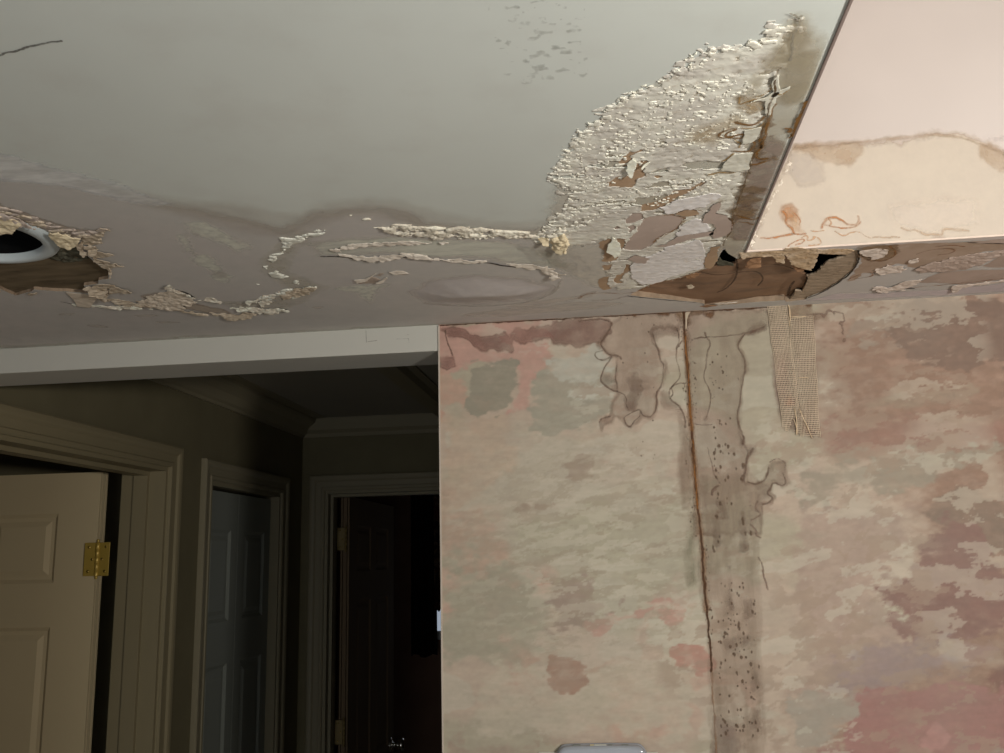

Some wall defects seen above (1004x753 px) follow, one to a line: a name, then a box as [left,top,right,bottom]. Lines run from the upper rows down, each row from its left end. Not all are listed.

peeling [0,207,317,321]
damp [0,17,1004,400]
peeling [607,150,662,187]
peeling [598,181,736,290]
peeling [750,161,792,247]
peeling [804,239,1004,301]
crack [440,13,811,706]
damp [711,411,775,518]
damp [706,582,760,700]